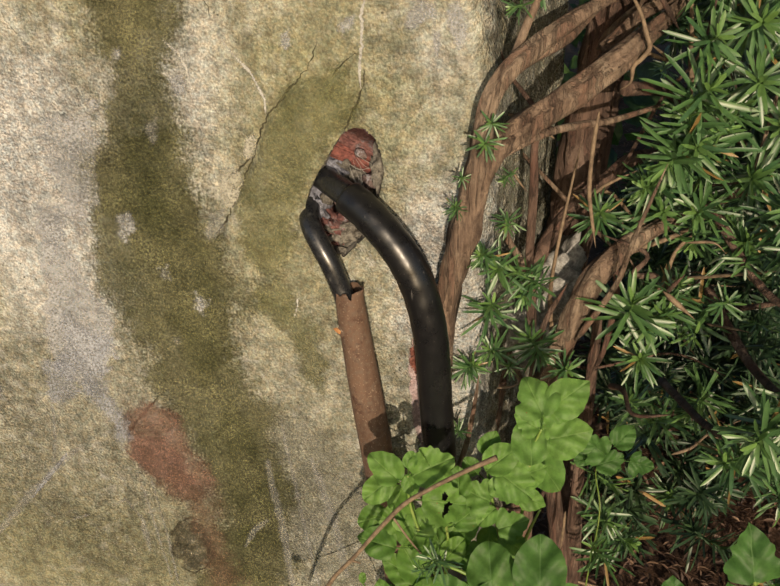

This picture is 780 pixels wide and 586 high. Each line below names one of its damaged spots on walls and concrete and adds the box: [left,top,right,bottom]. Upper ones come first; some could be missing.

leakage [99,0,162,55]
leakage [217,34,266,113]
crack [206,43,317,258]
leakage [96,126,379,586]
rust [122,402,215,501]